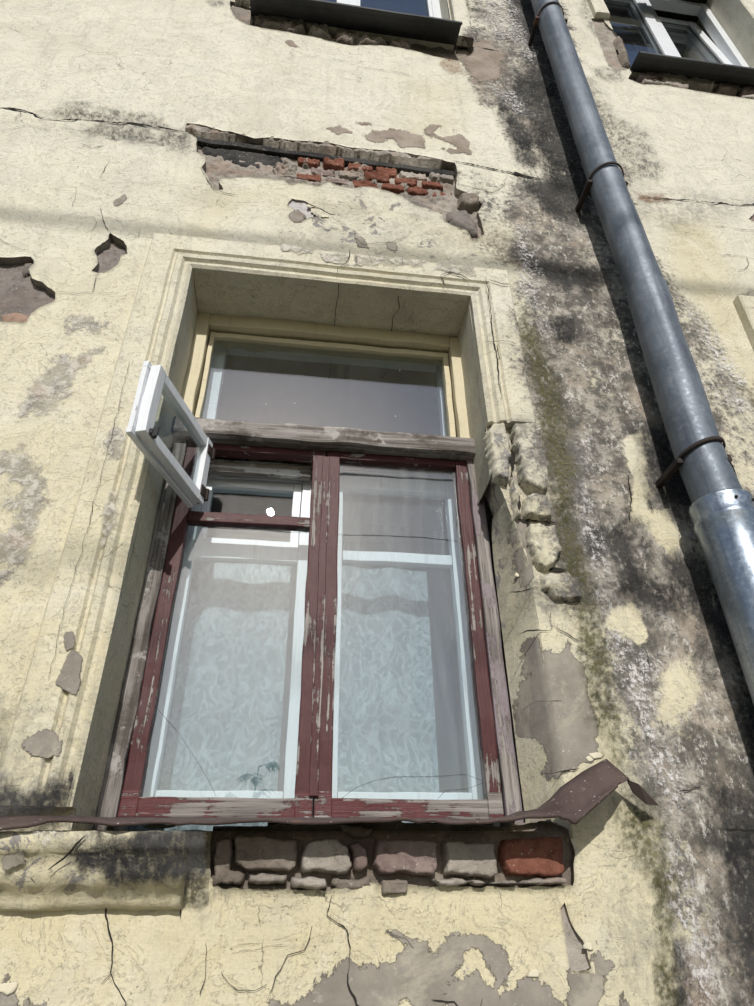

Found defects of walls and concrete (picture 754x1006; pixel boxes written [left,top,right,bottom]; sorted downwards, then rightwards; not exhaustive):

flaking render [231,6,508,84]
crack [0,107,183,177]
flaking render [186,121,508,241]
water stain [482,0,592,218]
flaking render [0,263,55,322]
flaking render [483,422,582,603]
water stain [583,498,743,672]
water stain [597,590,684,808]
water stain [68,827,207,885]
crack [101,908,126,1006]
peeling [269,905,615,1006]
water stain [669,843,720,1006]